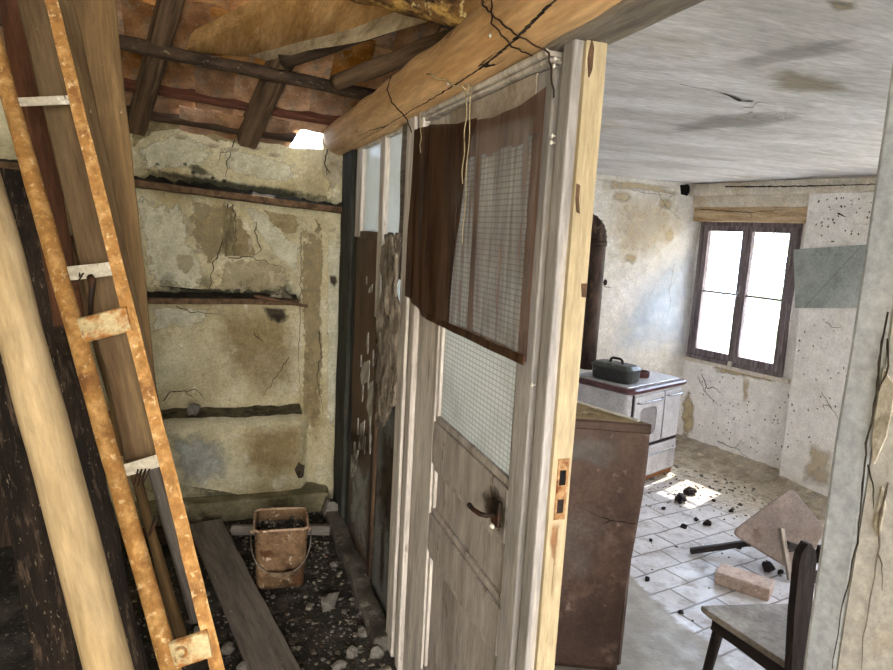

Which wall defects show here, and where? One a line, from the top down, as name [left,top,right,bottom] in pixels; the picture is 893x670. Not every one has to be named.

crack [681,84,753,102]
peeling [132,121,187,146]
peeling [322,138,343,189]
crack [209,204,323,412]
peeling [351,332,374,478]
spalling [682,392,755,440]
crack [832,312,889,670]